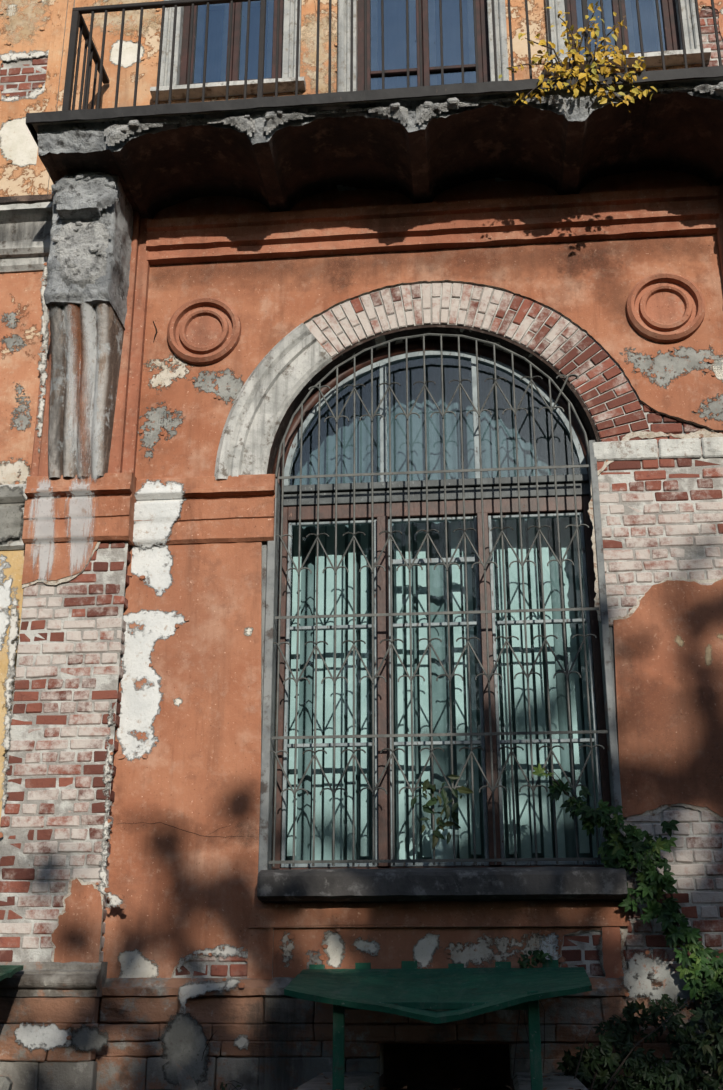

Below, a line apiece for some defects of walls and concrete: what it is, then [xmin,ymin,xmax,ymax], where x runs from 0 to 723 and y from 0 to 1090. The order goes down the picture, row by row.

flaking render [0,0,49,102]
flaking render [699,7,723,67]
peeling [137,354,244,461]
flaking render [305,281,723,626]
flaking render [0,479,189,978]
flaking render [173,944,248,1014]
peeling [279,927,381,969]
peeling [412,930,605,977]
flaking render [617,806,723,1014]
peeling [14,1021,73,1053]